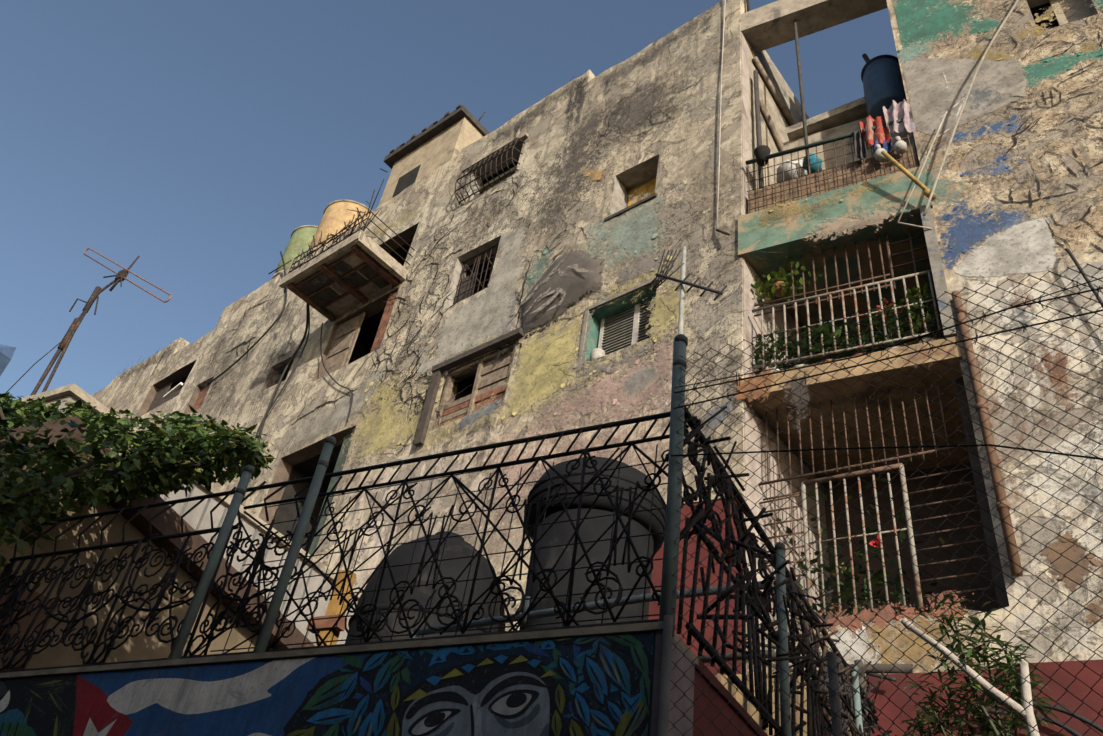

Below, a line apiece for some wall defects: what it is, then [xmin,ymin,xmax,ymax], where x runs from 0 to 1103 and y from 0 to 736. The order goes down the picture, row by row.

flaking render [1039,531,1103,632]